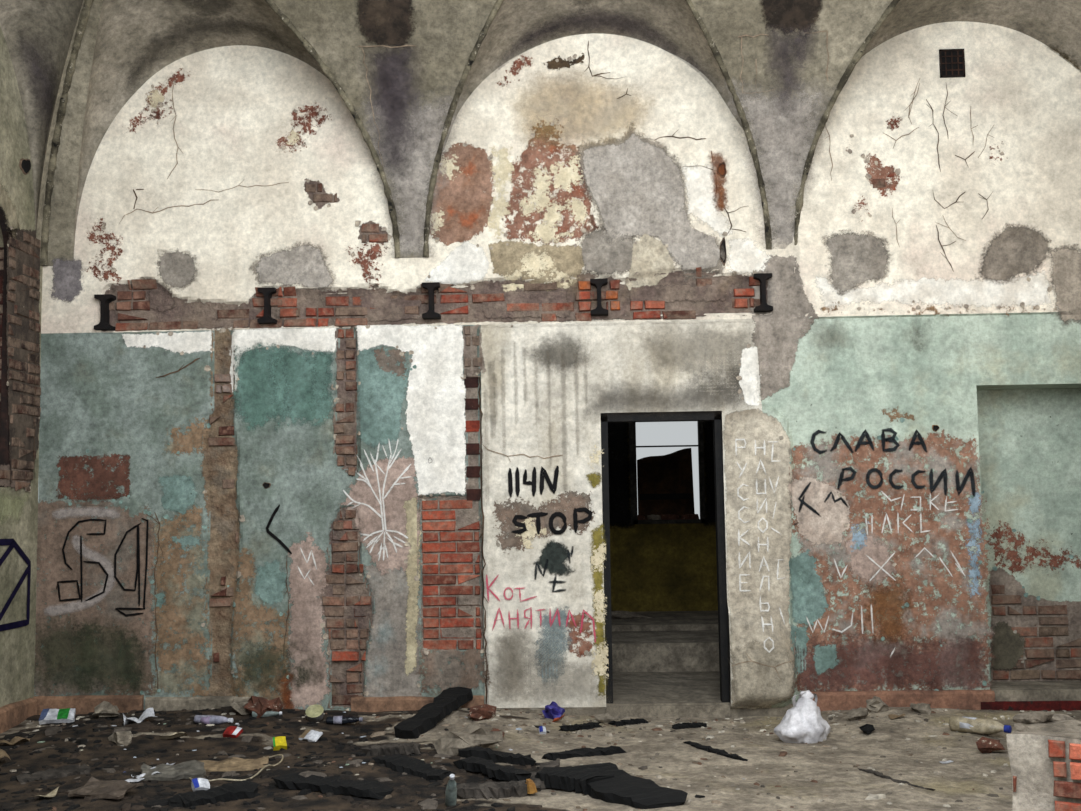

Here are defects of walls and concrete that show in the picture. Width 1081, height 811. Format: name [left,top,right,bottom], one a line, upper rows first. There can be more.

crack [119,80,289,224]
water stain [356,0,416,164]
peeling [430,120,599,250]
water stain [761,0,823,95]
crack [825,124,833,180]
crack [884,79,994,272]
peeling [0,218,768,711]
peeling [779,406,1081,693]
water stain [34,625,144,690]